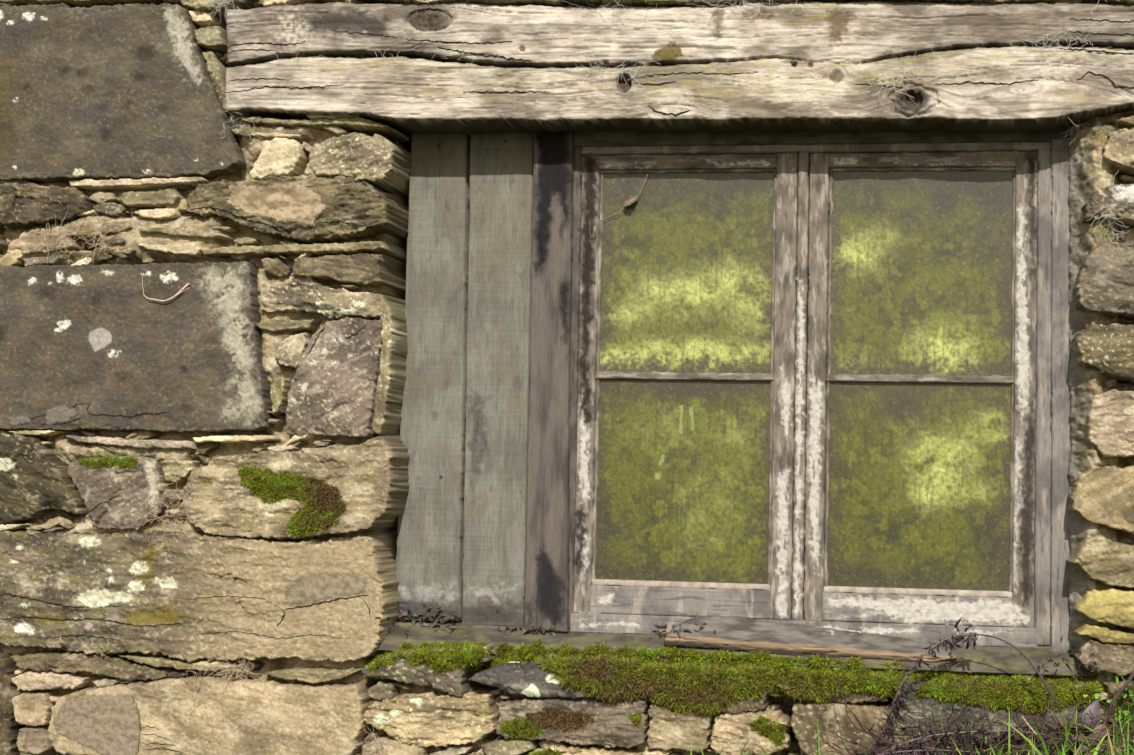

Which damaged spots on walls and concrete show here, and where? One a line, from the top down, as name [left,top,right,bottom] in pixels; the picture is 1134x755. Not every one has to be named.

damp [535,131,571,270]
damp [579,157,597,424]
peeling [1015,206,1030,424]
peeling [579,418,592,504]
peeling [775,278,823,617]
damp [575,511,587,572]
peeling [581,535,591,573]
peeling [822,437,1030,639]
crack [0,593,370,641]
peeling [598,594,614,605]
peeling [576,619,640,628]